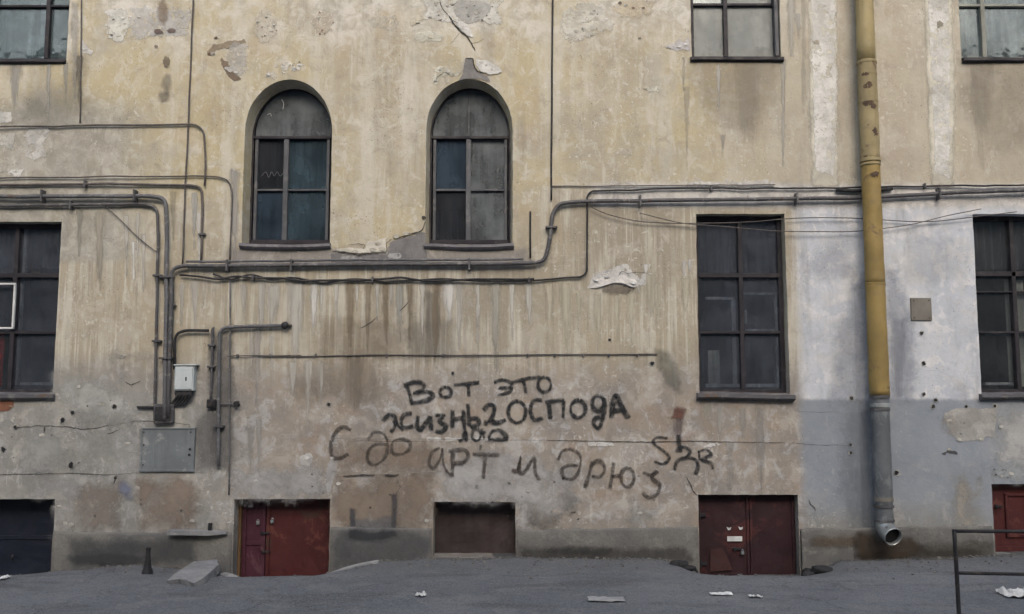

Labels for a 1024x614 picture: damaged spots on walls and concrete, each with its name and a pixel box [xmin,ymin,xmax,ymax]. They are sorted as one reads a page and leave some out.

peeling [105,7,191,42]
peeling [207,9,277,81]
peeling [422,0,503,25]
spalling [433,58,502,85]
corrosion [862,72,876,109]
leakage [191,193,200,264]
spalling [331,232,427,263]
leakage [250,281,339,419]
leakage [443,282,463,345]
leakage [476,282,532,377]
peeling [921,392,1024,480]